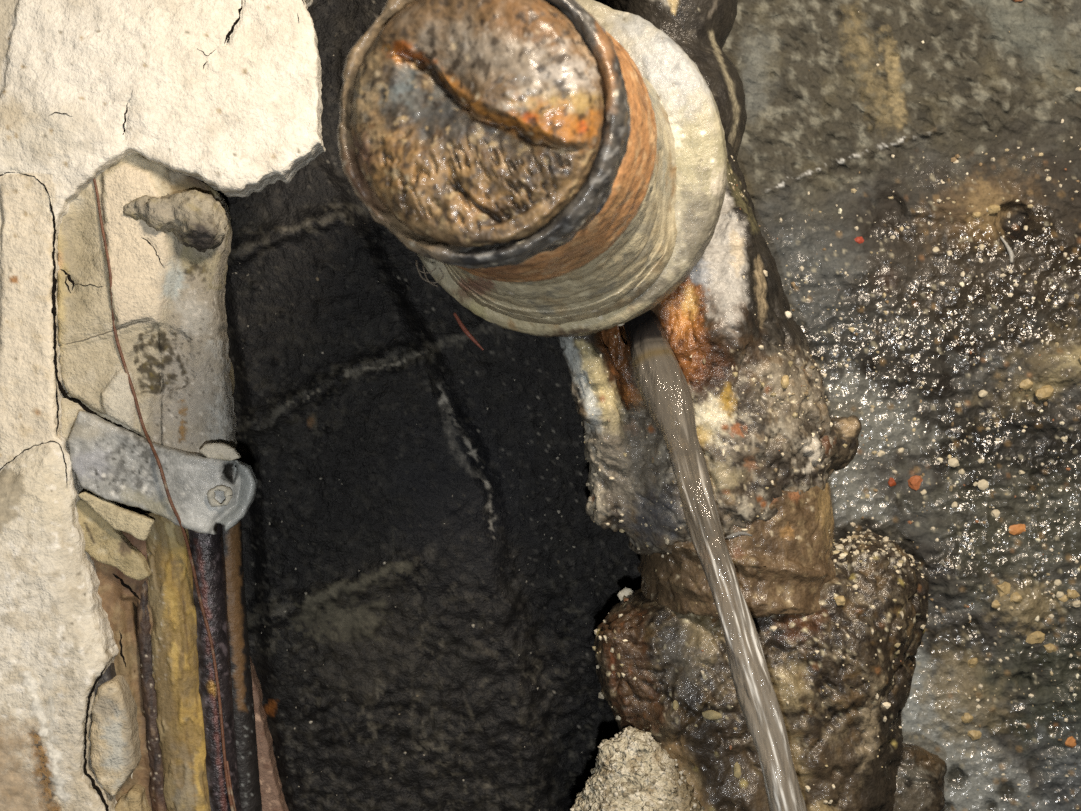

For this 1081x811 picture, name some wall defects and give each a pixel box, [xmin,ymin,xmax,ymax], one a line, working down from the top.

crack [198,0,243,70]
crack [123,88,134,135]
rust [598,326,636,411]
rust [659,277,735,391]
peeling [199,442,241,461]
peeling [76,491,155,581]
flaking render [90,675,142,797]
flaking render [250,656,289,811]